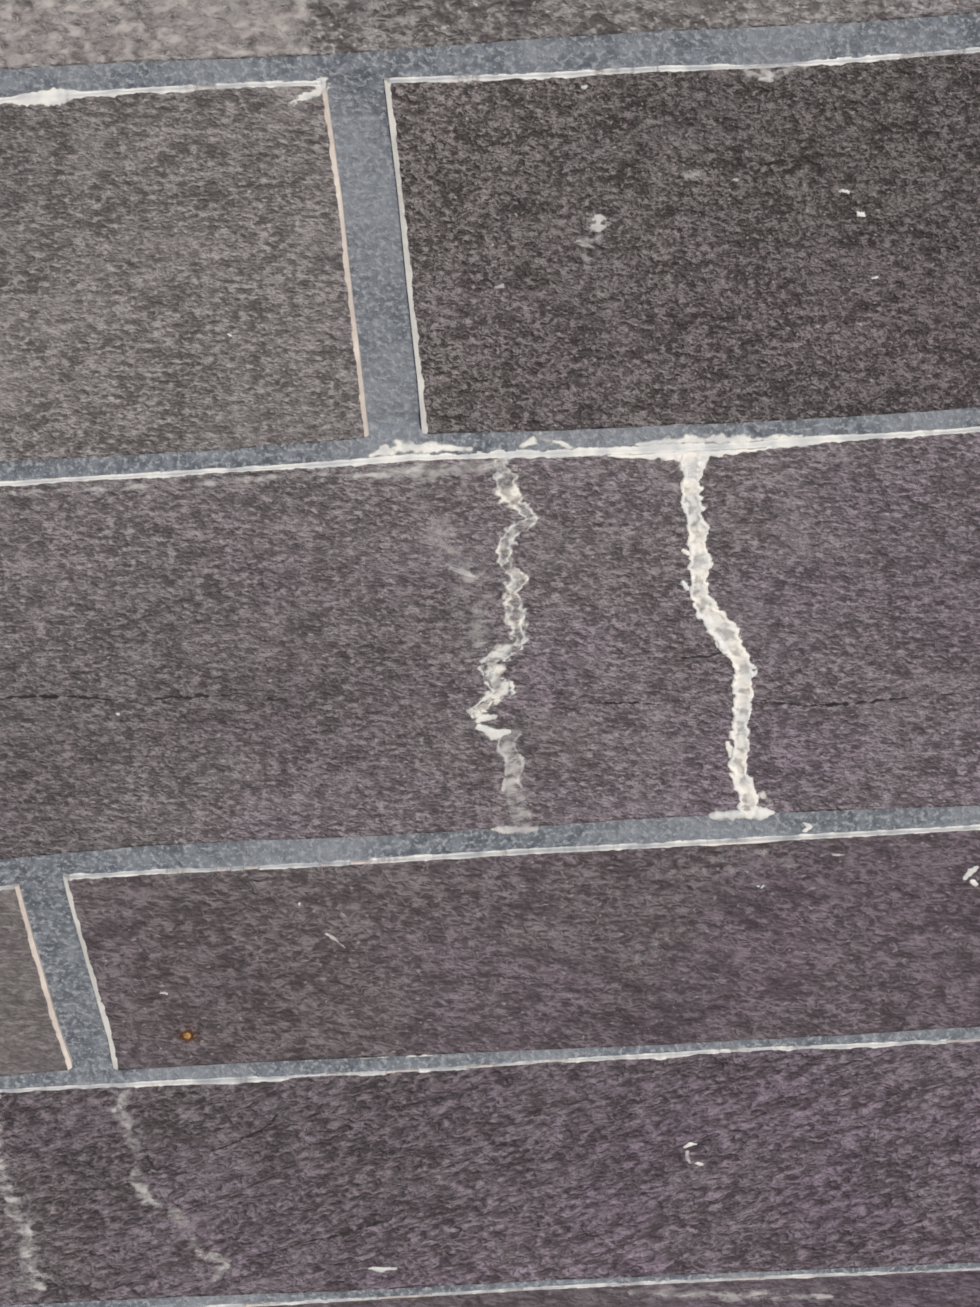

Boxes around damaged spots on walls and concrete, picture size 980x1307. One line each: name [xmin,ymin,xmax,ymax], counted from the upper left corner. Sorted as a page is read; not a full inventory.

crack [681,651,722,659]
crack [589,699,660,707]
rust [176,1026,201,1041]